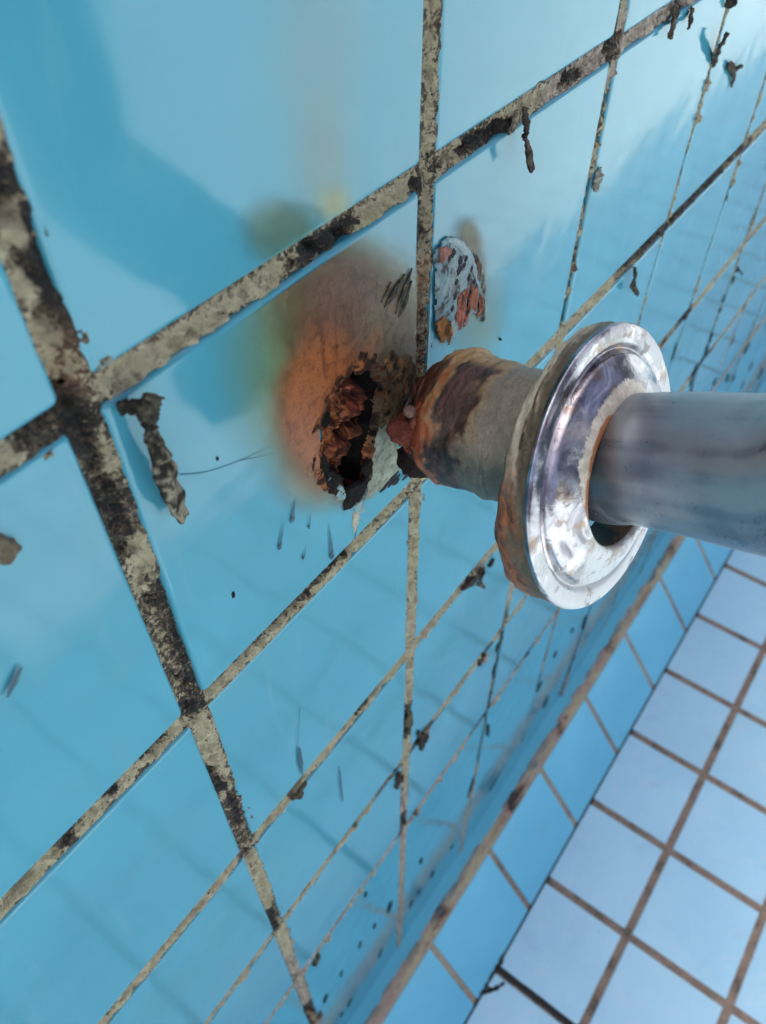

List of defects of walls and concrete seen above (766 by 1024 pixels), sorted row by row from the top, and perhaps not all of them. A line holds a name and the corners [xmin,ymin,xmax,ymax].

spalling [433,236,486,345]
peeling [116,392,189,525]
rust [261,246,417,499]
spalling [320,366,408,515]